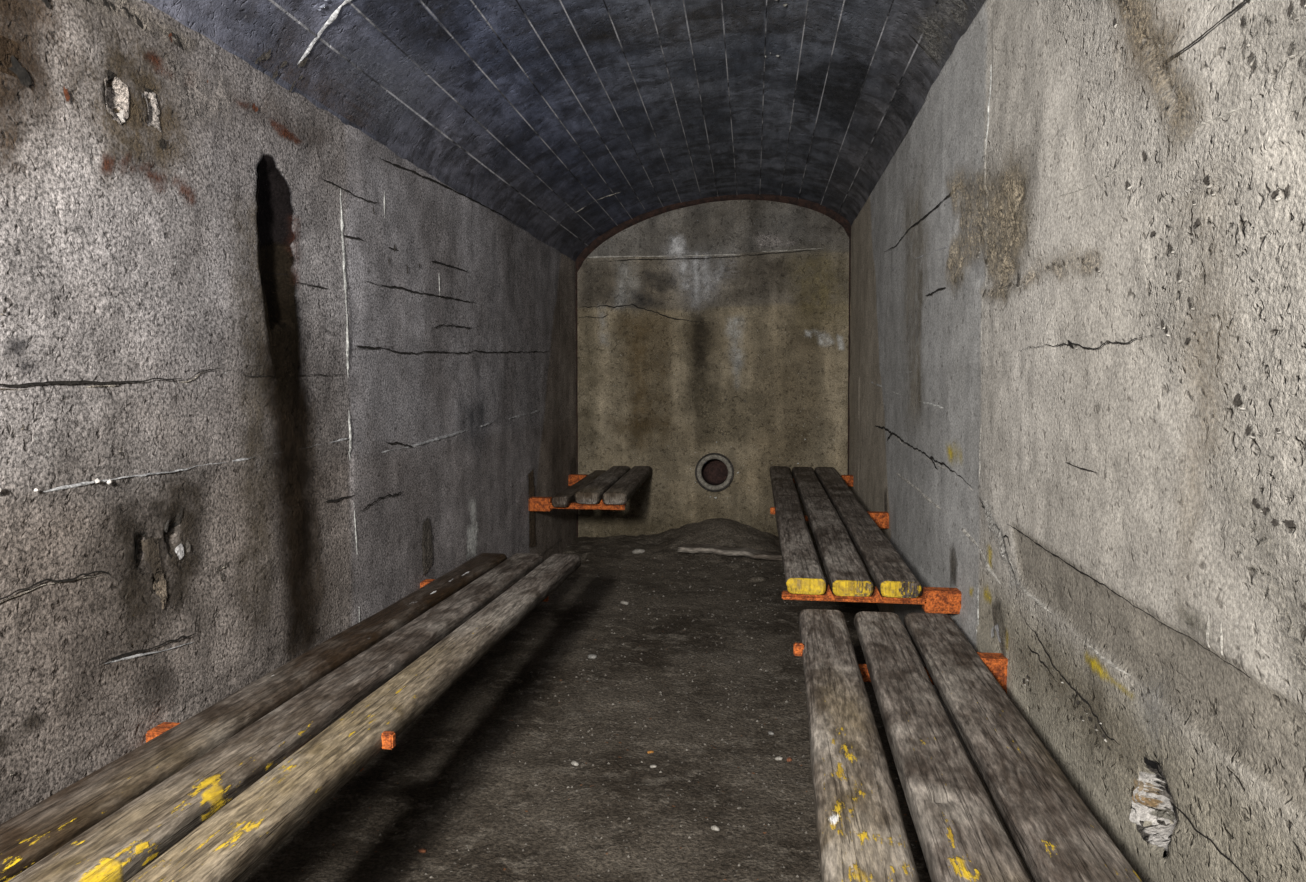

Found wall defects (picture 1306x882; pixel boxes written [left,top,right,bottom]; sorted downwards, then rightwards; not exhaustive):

crack [1163,0,1255,68]
spalling [104,70,165,148]
crack [380,158,526,229]
crack [884,181,963,252]
spalling [946,174,1101,299]
crack [0,261,549,390]
crack [1019,335,1151,351]
leakage [249,154,321,656]
crack [323,492,401,512]
crack [875,425,1250,678]
spalling [1129,757,1179,856]
crack [1171,803,1251,882]